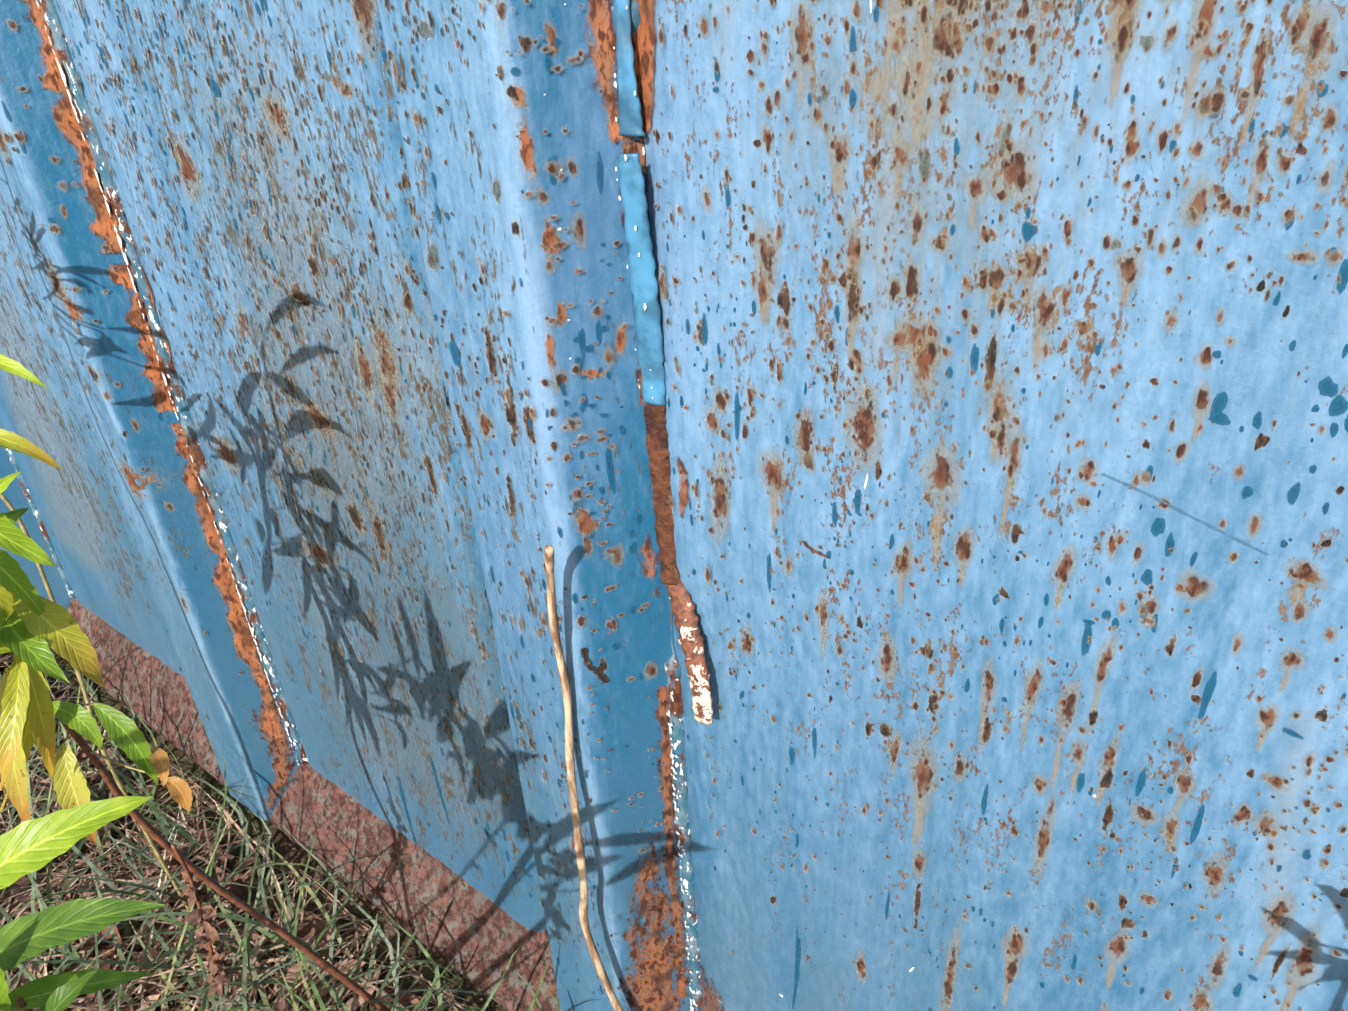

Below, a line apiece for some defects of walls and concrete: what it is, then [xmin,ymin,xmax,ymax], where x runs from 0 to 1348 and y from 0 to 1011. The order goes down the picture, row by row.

peeling [612,0,645,136]
peeling [615,153,713,724]
peeling [666,710,695,1011]